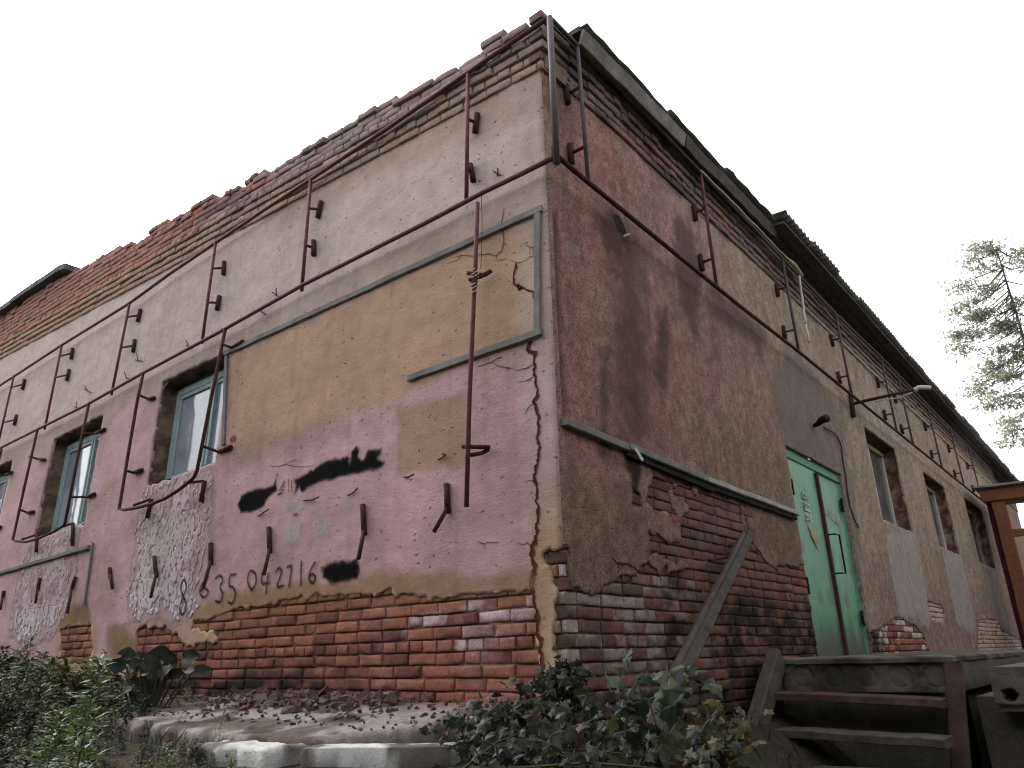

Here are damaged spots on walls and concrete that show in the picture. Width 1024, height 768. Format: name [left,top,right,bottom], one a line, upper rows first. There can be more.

crack [447,210,534,299]
crack [478,341,544,666]
peeling [9,526,93,664]
flaking render [126,466,539,705]
flaking render [544,468,819,742]
flaking render [870,617,931,654]
flaking render [978,615,1022,651]